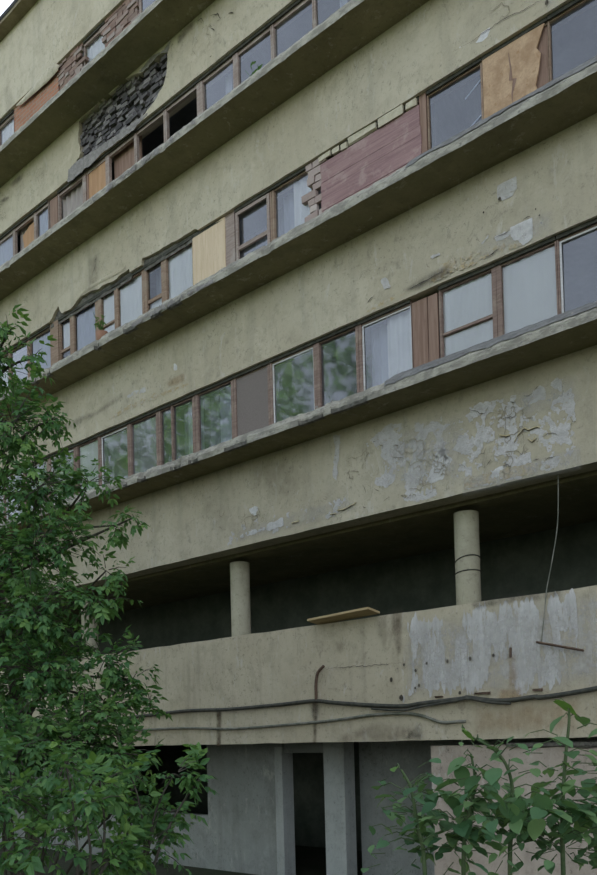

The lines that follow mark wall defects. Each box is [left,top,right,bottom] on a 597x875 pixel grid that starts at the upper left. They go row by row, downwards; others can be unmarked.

flaking render [67,41,171,182]
peeling [430,218,533,282]
peeling [366,378,576,502]
peeling [402,588,578,703]